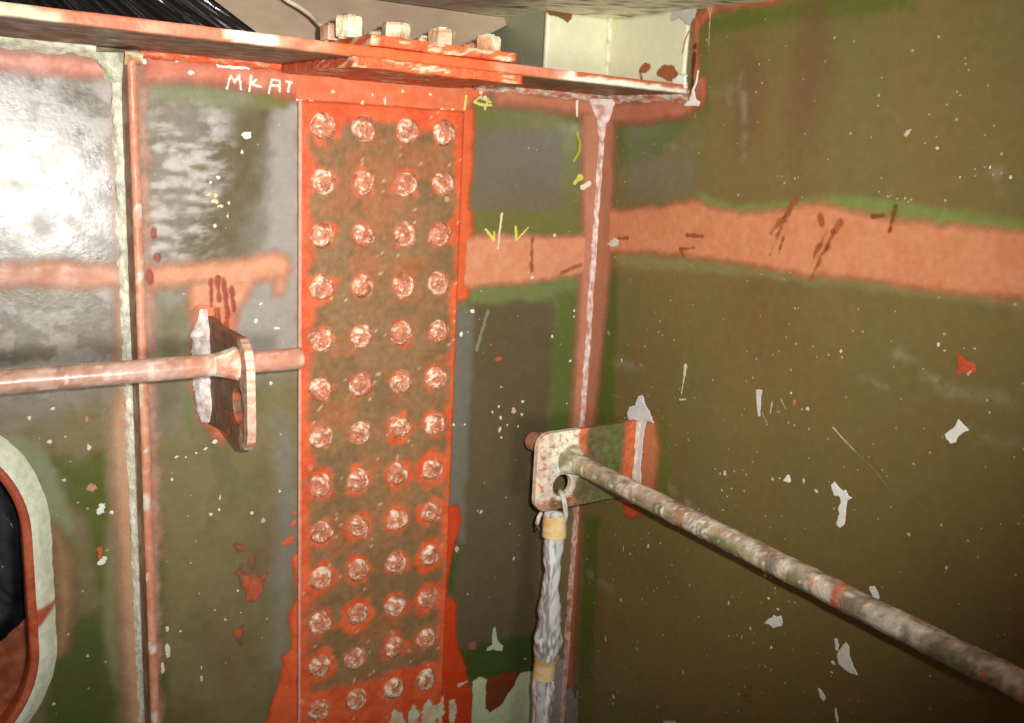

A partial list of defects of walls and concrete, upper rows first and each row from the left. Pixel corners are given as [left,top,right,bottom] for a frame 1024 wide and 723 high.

corrosion [639,63,678,81]
corrosion [771,197,798,249]
corrosion [871,205,897,232]
corrosion [809,213,843,281]
corrosion [209,276,236,328]
peeling [945,419,969,444]
peeling [831,482,852,528]
corrosion [234,543,267,602]
peeling [763,574,784,628]
peeling [468,627,503,651]
peeling [831,638,858,677]